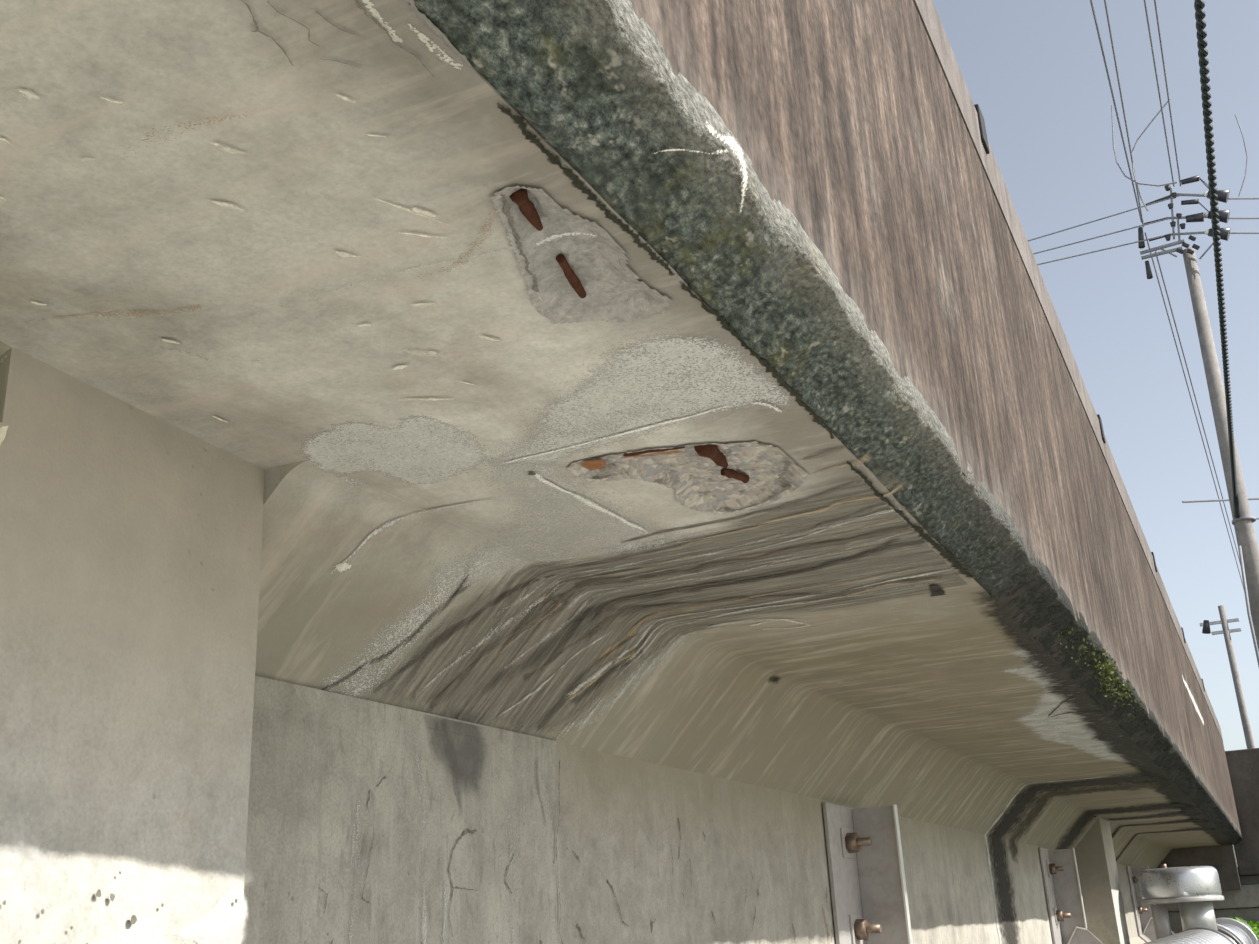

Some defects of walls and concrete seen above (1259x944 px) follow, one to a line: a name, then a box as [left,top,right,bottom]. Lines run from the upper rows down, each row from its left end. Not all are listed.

crack [241,0,362,68]
crack [405,0,471,68]
damp [377,199,444,238]
spalling [489,185,673,324]
damp [654,121,748,212]
crack [497,103,973,579]
peeling [0,422,8,446]
spalling [565,441,808,515]
damp [298,328,964,787]
damp [979,574,1239,944]
crack [362,776,386,903]
crack [448,827,514,937]